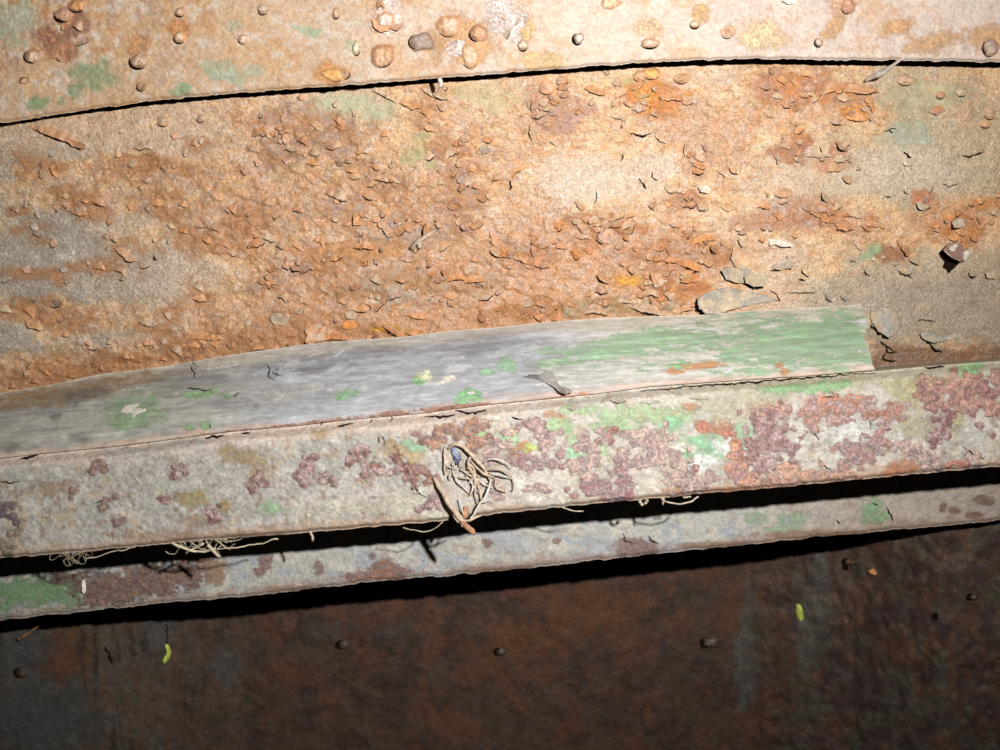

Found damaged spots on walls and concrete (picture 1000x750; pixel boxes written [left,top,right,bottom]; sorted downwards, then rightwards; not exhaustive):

spalling [36,10,92,62]
corrosion [408,10,501,70]
crack [0,58,1000,125]
corrosion [507,15,566,95]
spalling [520,70,694,147]
spalling [755,66,878,126]
corrosion [0,115,278,286]
spalling [248,94,886,329]
spalling [932,193,1000,262]
corrosion [411,367,1000,502]
corrosion [345,442,444,515]
corrosion [52,550,226,608]